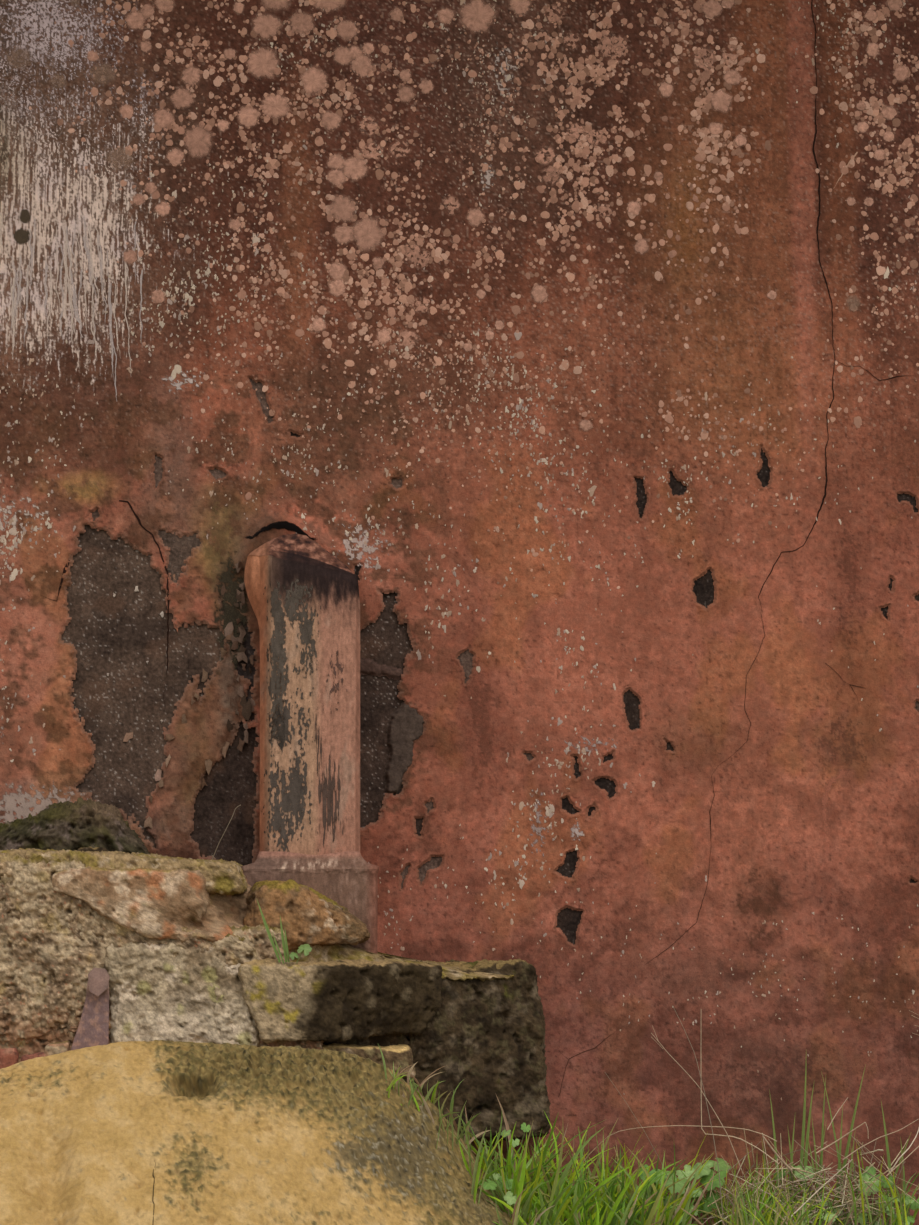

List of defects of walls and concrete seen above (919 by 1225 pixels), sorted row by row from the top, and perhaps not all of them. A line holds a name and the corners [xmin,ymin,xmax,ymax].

water stain [493,48,518,103]
water stain [0,0,172,401]
spalling [628,465,693,524]
spalling [751,440,776,493]
crack [646,0,912,964]
spalling [893,488,919,520]
spalling [688,563,720,615]
spalling [55,505,447,894]
spalling [619,685,646,735]
spalling [555,747,622,825]
spalling [549,845,583,883]